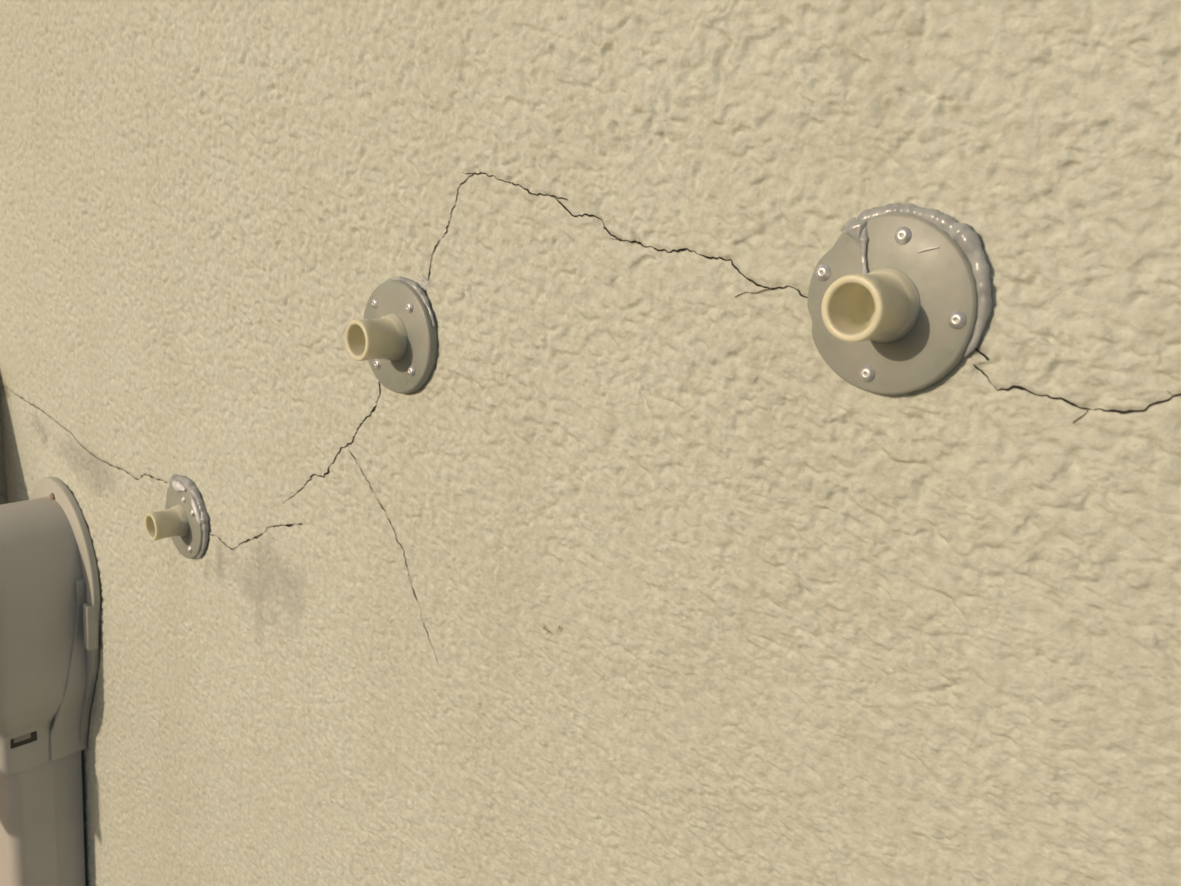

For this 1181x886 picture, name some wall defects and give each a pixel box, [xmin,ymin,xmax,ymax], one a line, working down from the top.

crack [423,172,808,298]
crack [5,386,167,483]
crack [973,348,1181,423]
crack [208,381,437,660]